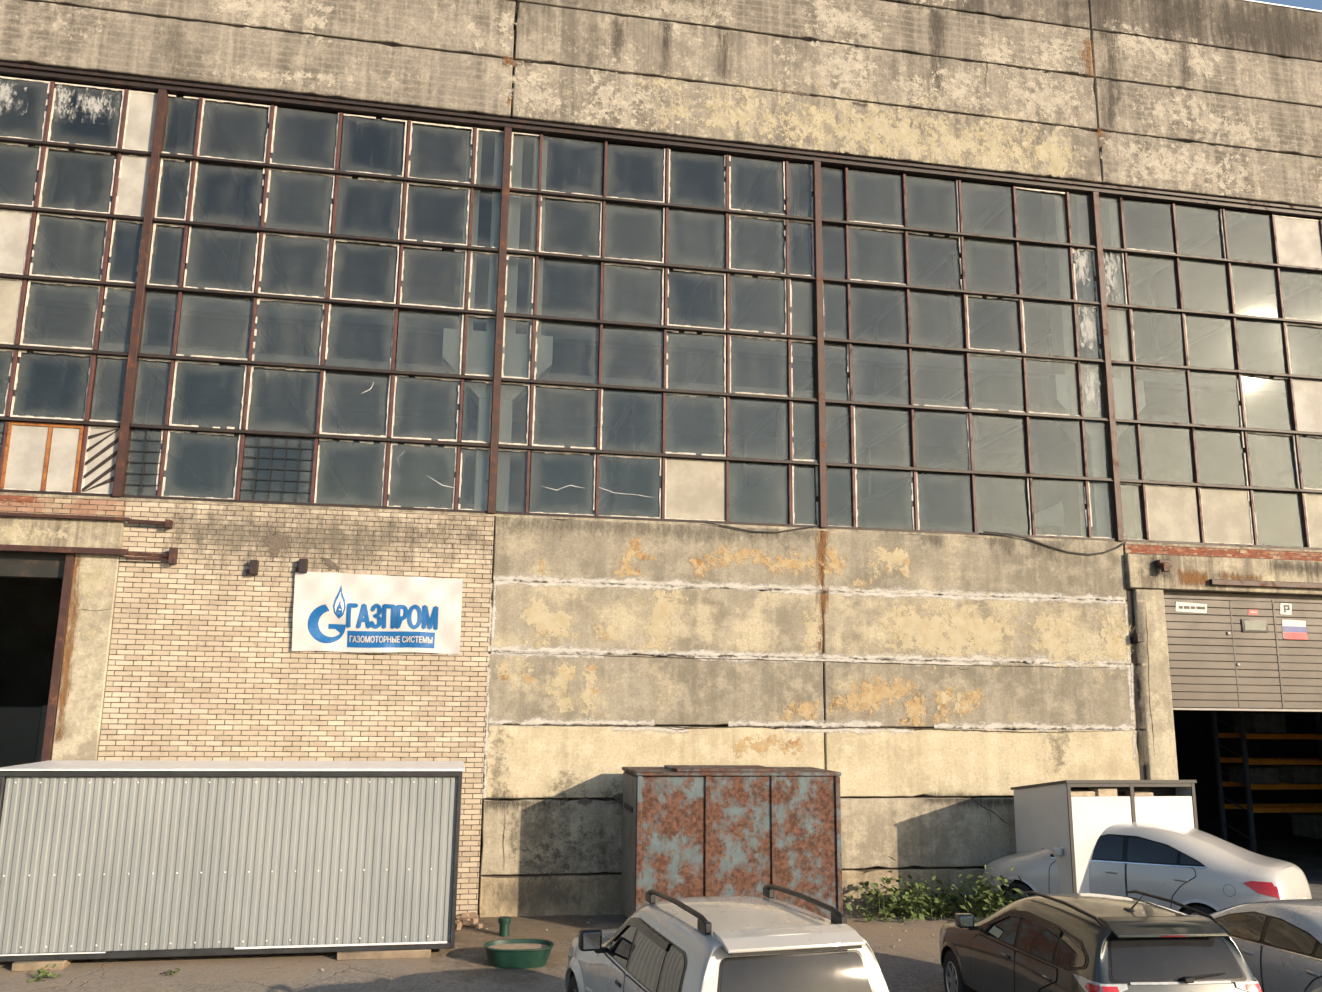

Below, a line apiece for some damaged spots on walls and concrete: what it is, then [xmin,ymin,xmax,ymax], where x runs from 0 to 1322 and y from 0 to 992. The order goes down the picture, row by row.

peeling [495,537,689,718]
rust [817,531,829,655]
peeling [689,544,1134,758]